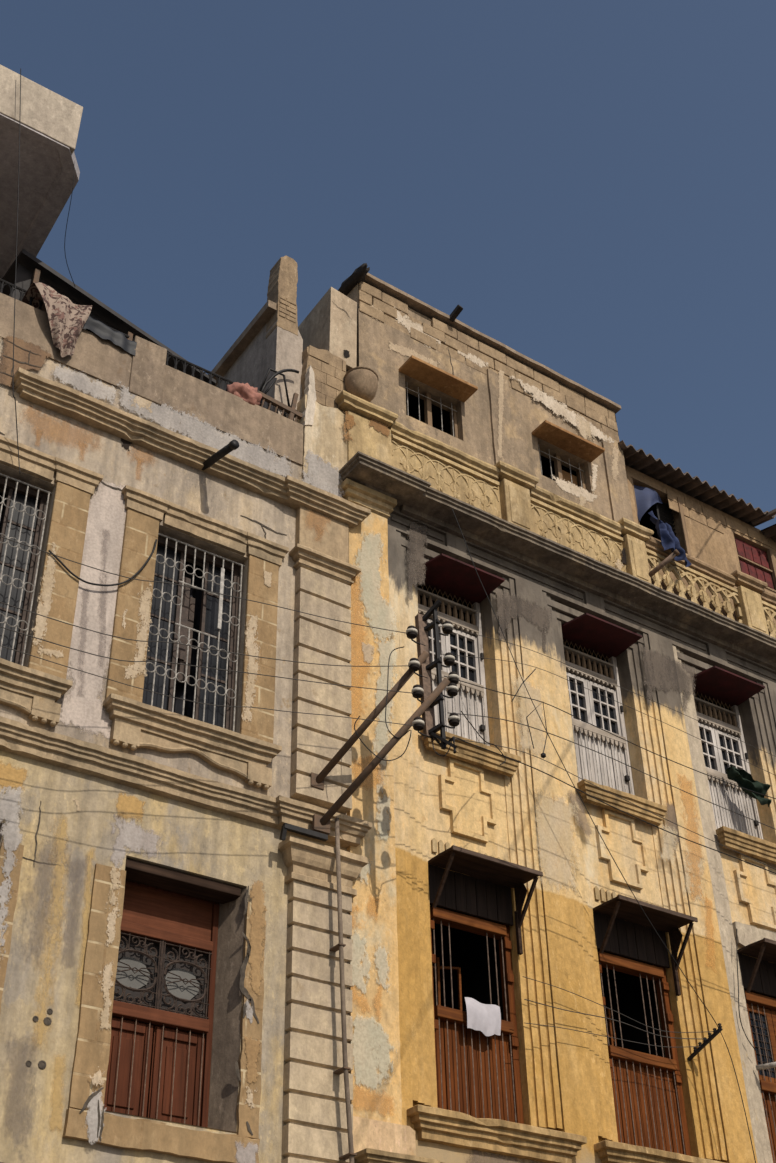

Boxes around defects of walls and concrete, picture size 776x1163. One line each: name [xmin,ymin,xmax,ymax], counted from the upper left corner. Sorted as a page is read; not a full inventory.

peeling [509,376,620,507]
peeling [0,786,24,961]
crack [23,804,60,866]
peeling [105,815,160,947]
peeling [359,862,371,884]
peeling [99,962,114,1034]
crack [240,886,259,1023]
peeling [350,930,390,994]
peeling [350,1014,394,1091]
spalling [86,1066,107,1145]